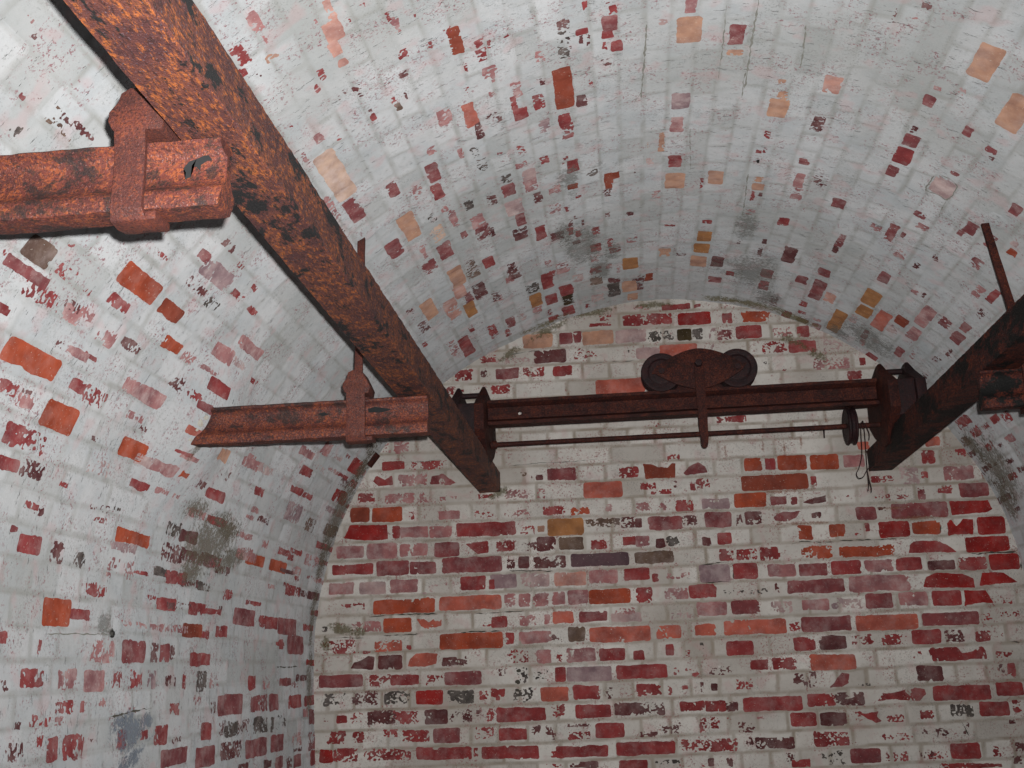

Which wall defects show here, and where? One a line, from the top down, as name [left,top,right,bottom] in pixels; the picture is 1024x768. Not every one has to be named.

peeling [46,106,94,142]
peeling [229,10,279,78]
peeling [301,132,366,231]
peeling [436,2,623,171]
peeling [646,93,691,199]
peeling [659,0,703,43]
peeling [885,126,921,177]
peeling [2,234,141,354]
peeling [186,238,258,315]
peeling [384,145,1002,395]
leakage [215,519,243,573]
peeling [0,261,1024,768]